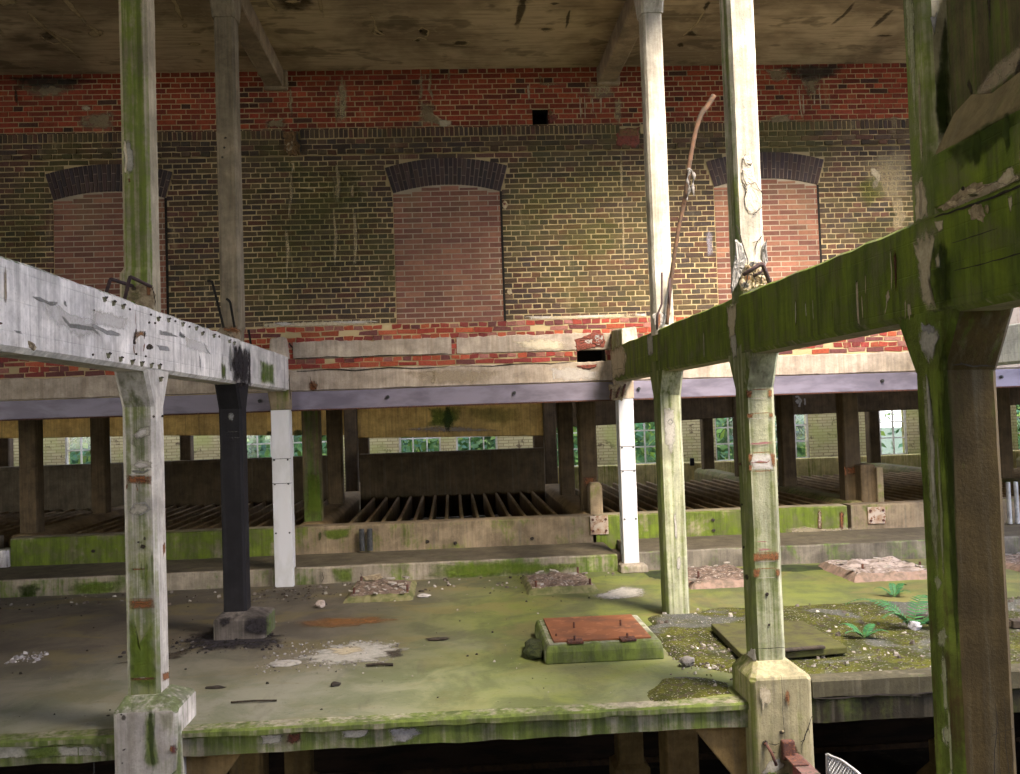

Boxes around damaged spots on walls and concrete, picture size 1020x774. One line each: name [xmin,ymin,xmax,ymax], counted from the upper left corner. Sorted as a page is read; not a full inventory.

spalling [741,154,763,215]
damp [870,156,906,227]
peeling [913,167,1019,306]
damp [222,346,251,382]
peeling [919,323,939,362]